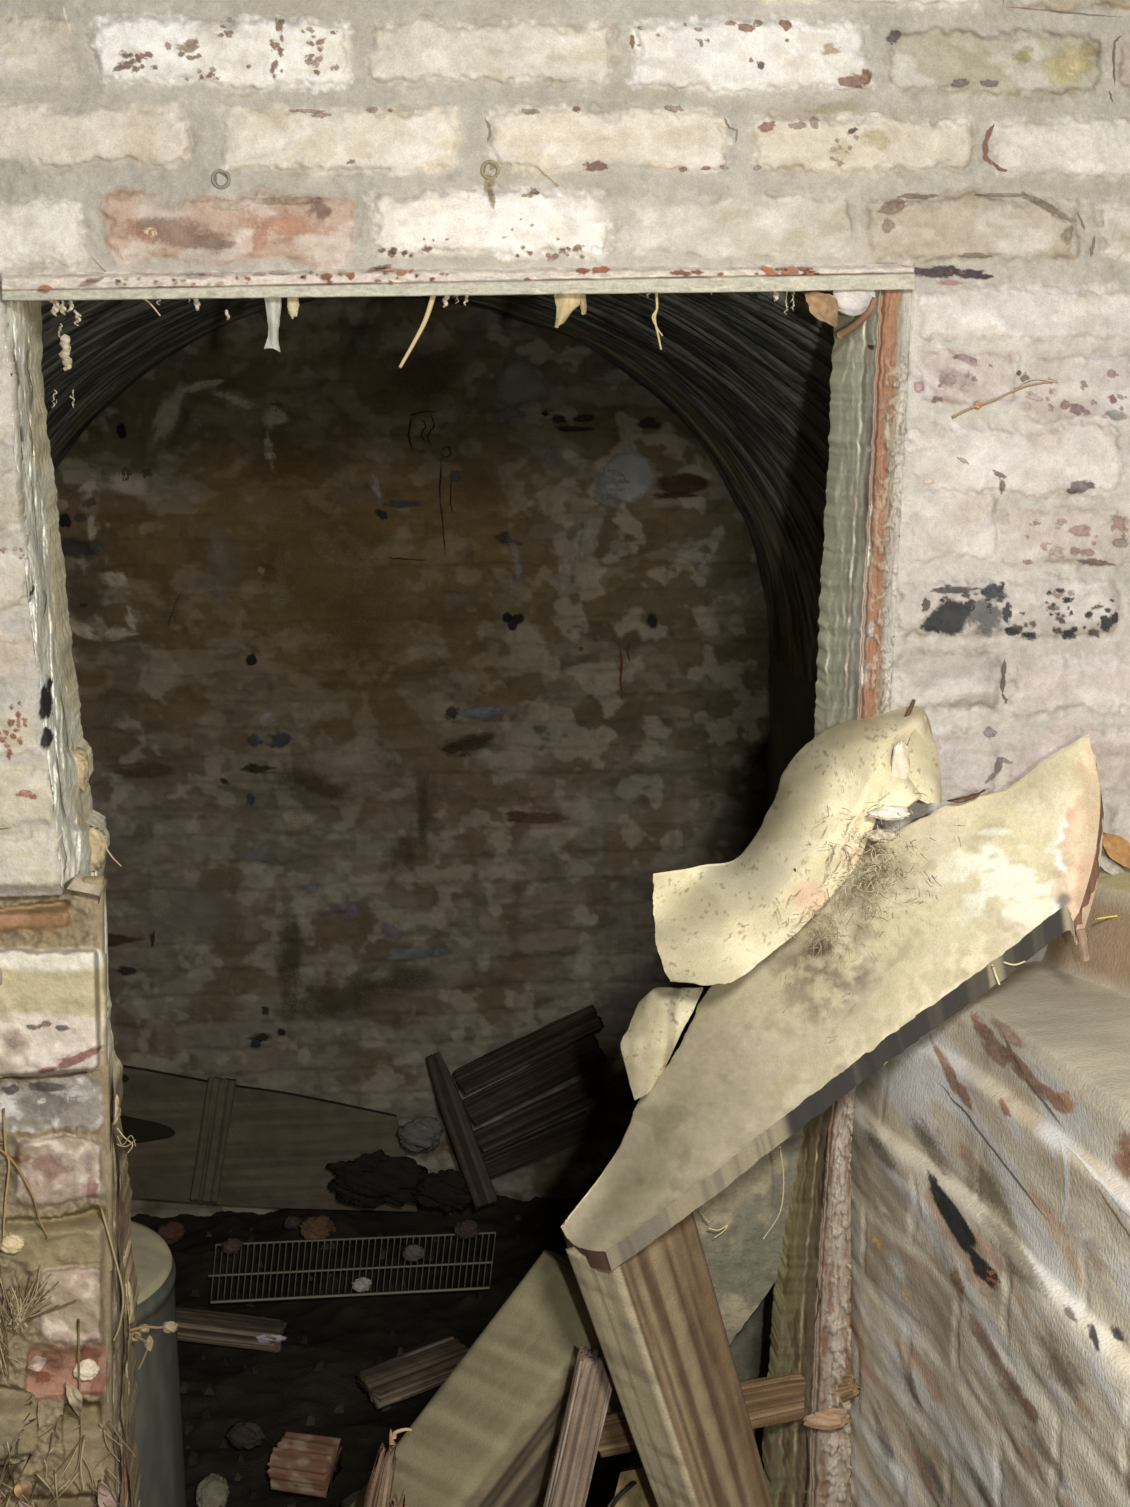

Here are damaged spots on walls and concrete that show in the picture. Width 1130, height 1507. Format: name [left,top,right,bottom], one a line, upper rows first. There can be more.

peeling [921,582,1118,640]
spalling [928,1172,1038,1424]